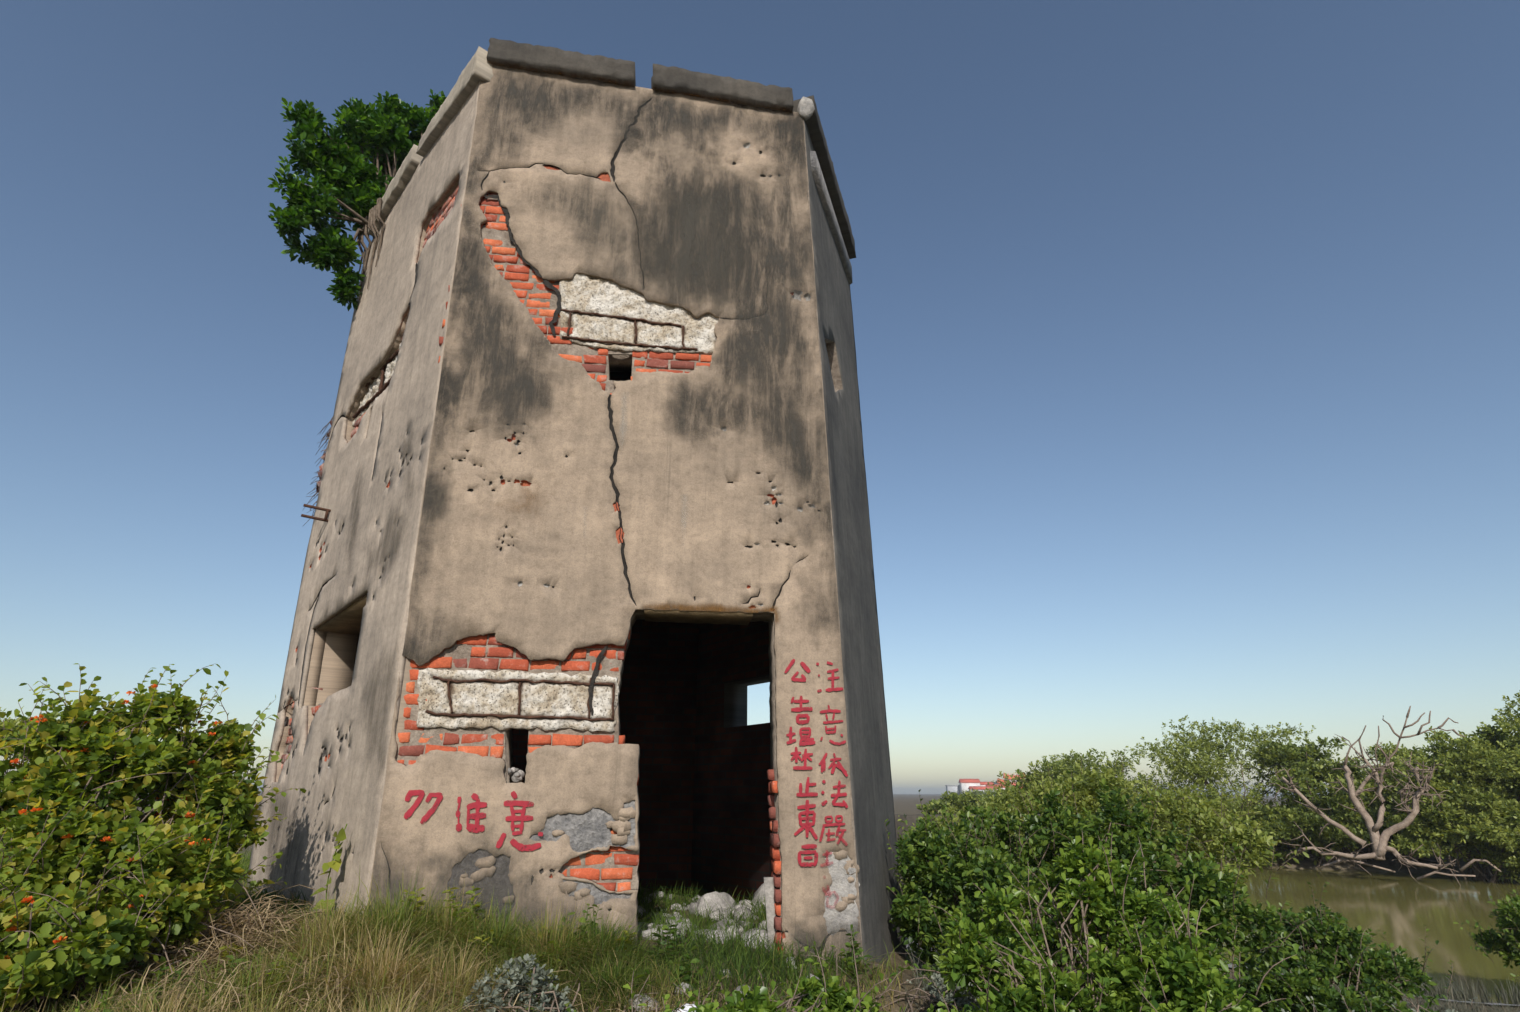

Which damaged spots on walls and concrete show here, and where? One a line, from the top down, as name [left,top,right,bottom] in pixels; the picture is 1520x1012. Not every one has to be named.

spalling [350,336,403,440]
crack [478,98,652,290]
spalling [422,180,719,394]
leakage [437,70,744,428]
leakage [641,116,832,531]
leakage [421,474,442,542]
crack [607,395,637,606]
spalling [397,629,631,777]
peeling [447,849,515,919]
peeling [530,774,639,911]
flaking render [767,769,819,979]